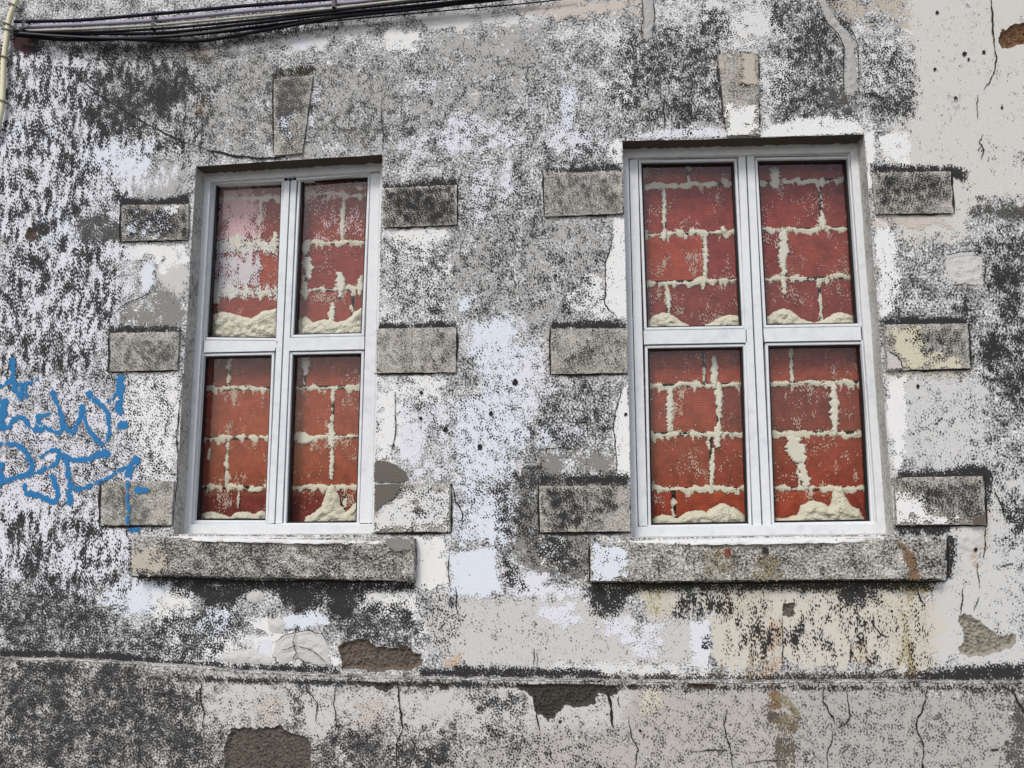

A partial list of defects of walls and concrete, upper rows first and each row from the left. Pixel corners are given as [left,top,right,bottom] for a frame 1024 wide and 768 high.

flaking render [545,0,1024,318]
crack [976,0,997,160]
peeling [0,0,642,668]
flaking render [190,158,1024,768]
leakage [882,195,1024,636]
crack [395,683,403,768]
crack [822,642,852,768]
crack [915,686,929,766]